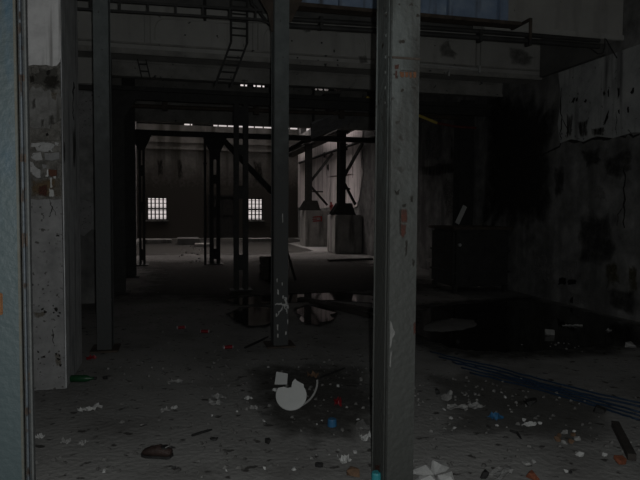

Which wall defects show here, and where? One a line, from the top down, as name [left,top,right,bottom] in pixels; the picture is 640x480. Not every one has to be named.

spalling [30,67,60,89]
flaking render [30,133,60,179]